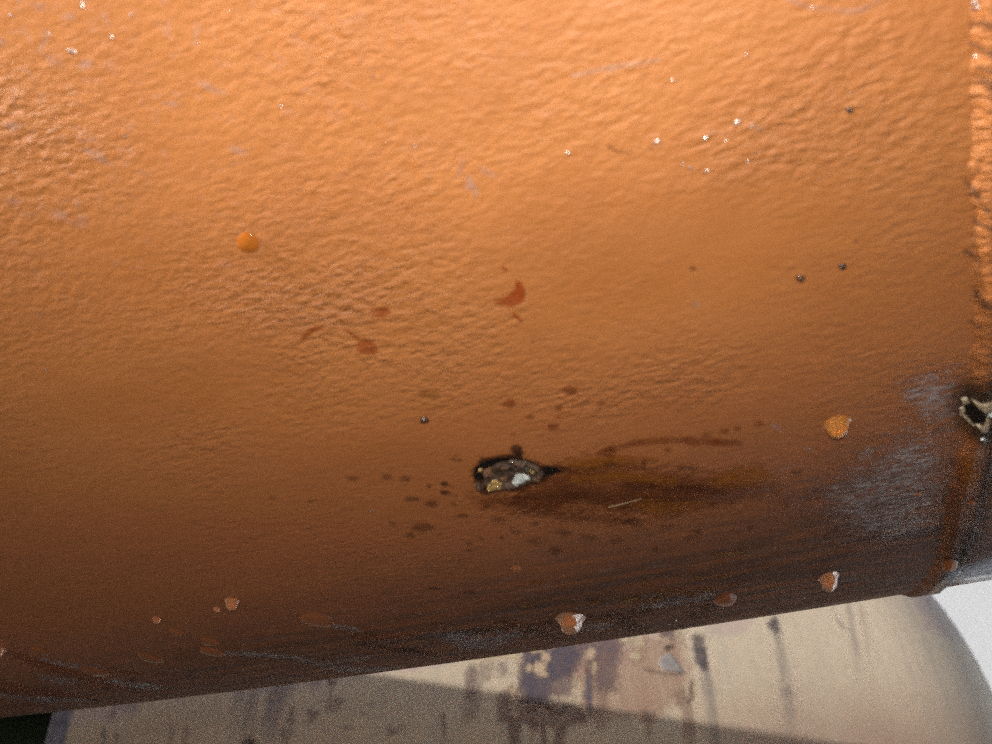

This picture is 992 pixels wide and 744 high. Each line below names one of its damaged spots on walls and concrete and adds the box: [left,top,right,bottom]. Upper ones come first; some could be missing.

rust [505,281,525,321]
peeling [954,382,992,444]
rust [474,445,526,492]